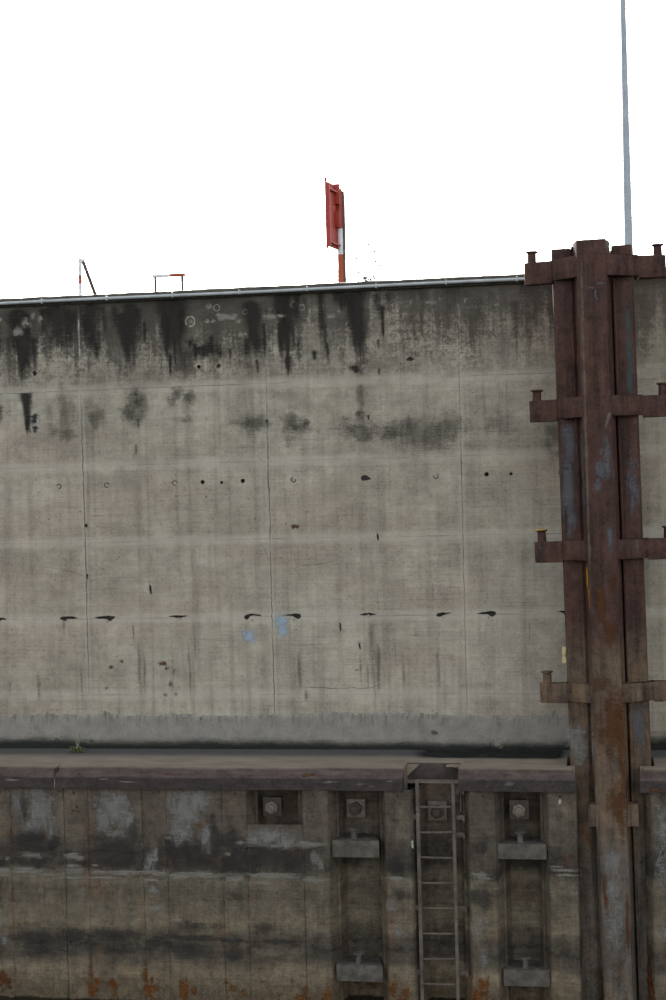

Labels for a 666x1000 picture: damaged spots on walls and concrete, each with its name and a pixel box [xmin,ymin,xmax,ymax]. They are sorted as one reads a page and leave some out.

water stain [9,309,36,375]
water stain [40,303,146,362]
water stain [157,300,231,374]
water stain [243,294,300,372]
water stain [312,291,388,360]
water stain [20,393,39,431]